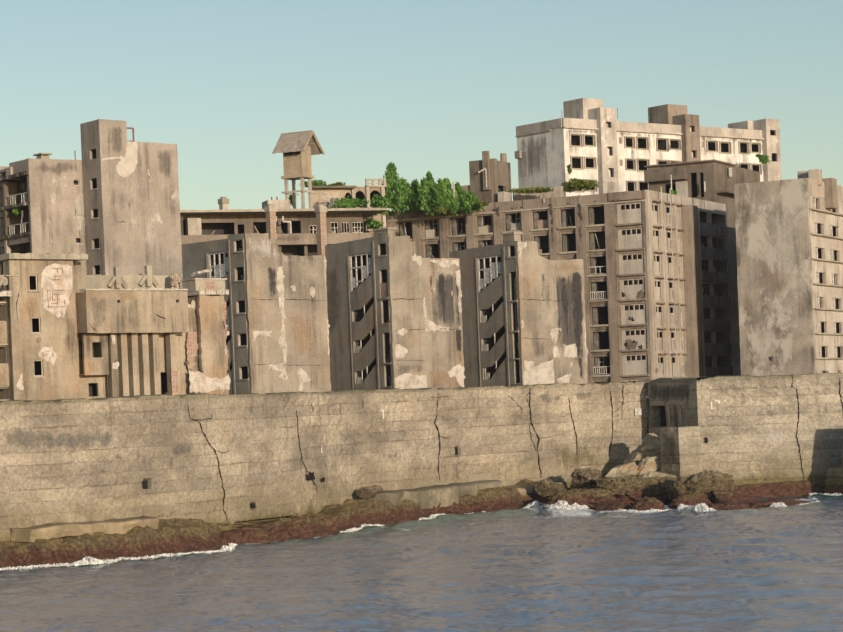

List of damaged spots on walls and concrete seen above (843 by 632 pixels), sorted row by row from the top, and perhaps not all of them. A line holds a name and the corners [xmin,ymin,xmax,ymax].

peeling [101,141,138,177]
peeling [41,263,73,318]
peeling [186,299,231,393]
water stain [436,274,461,350]
peeling [523,321,588,385]
water stain [557,272,583,376]
crack [187,404,229,517]
crack [287,410,317,490]
crack [430,393,454,480]
crack [507,388,578,474]
crack [609,386,624,453]
crack [791,376,804,479]